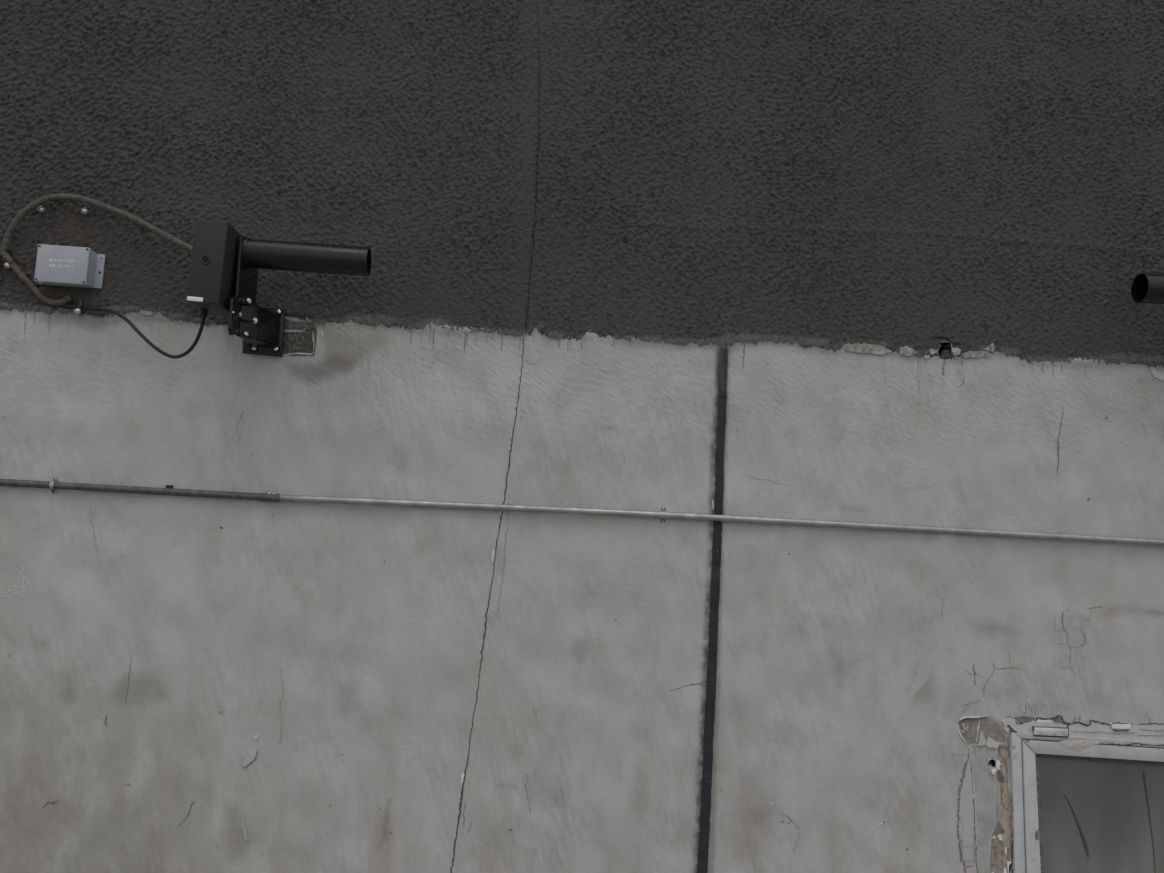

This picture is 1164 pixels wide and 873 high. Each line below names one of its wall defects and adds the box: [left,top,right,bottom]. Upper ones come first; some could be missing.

crack [450,2,540,873]
spalling [957,716,1016,873]